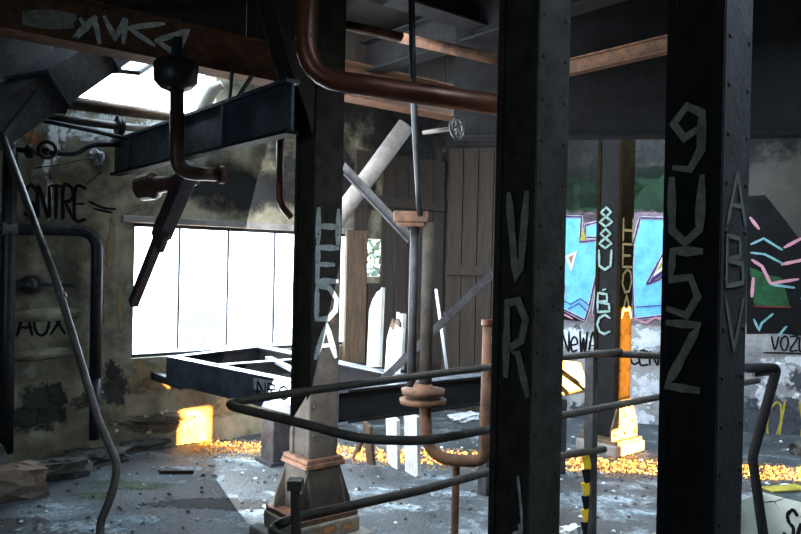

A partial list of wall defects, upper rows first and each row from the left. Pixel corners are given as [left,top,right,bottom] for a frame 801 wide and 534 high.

leakage [14,381,68,433]
peeling [743,376,769,432]
peeling [760,356,801,436]